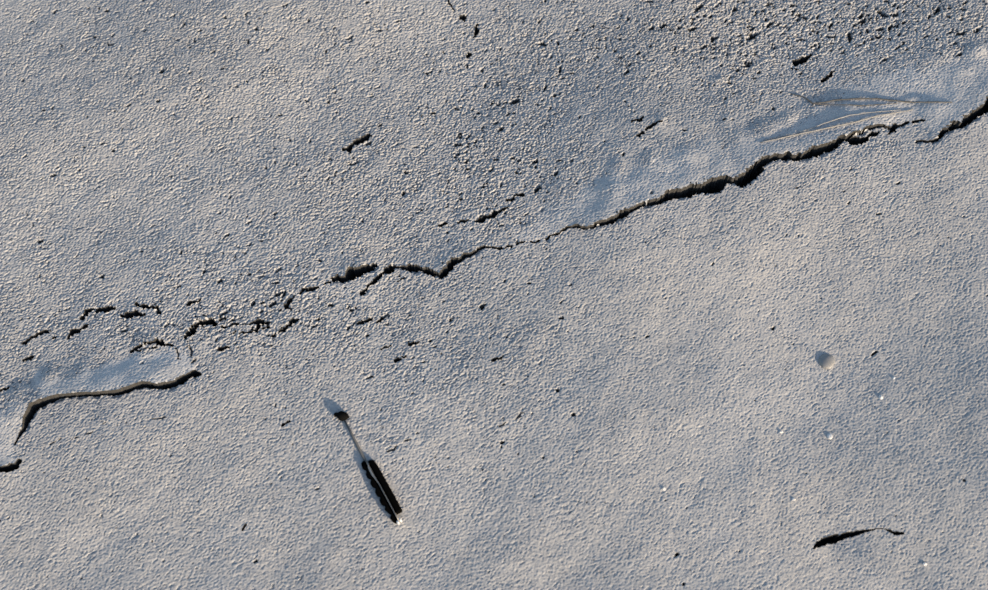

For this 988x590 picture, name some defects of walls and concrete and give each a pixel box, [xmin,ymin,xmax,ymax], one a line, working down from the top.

crack [447,0,480,59]
crack [791,53,836,83]
crack [0,94,988,473]
crack [813,528,904,550]